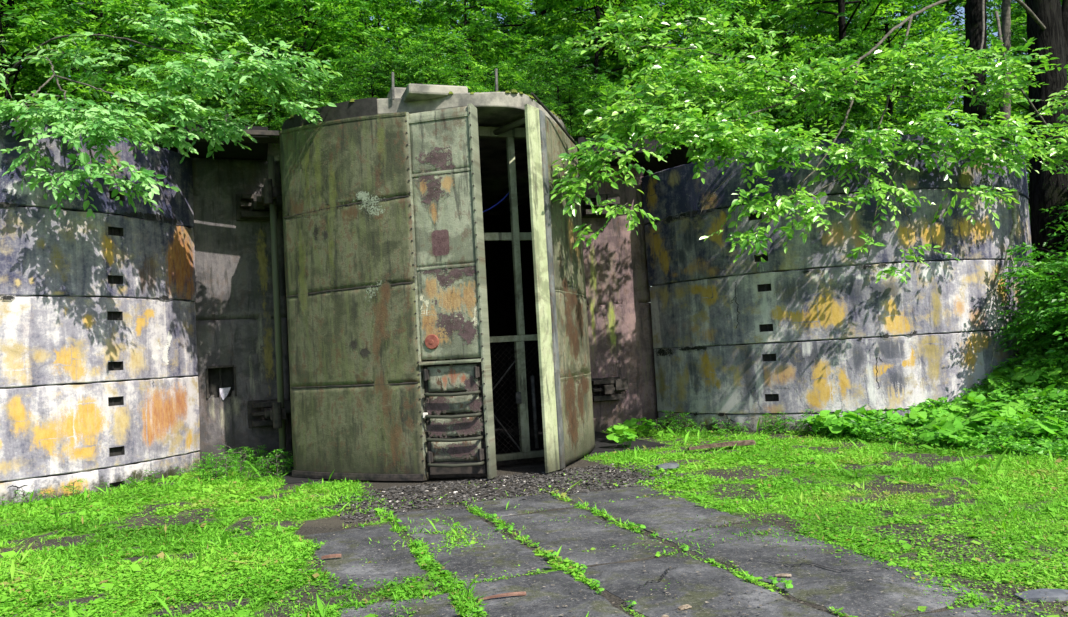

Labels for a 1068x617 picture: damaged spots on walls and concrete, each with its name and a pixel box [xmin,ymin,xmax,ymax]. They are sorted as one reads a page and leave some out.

rust [134,379,191,458]
rust [418,169,455,230]
rust [441,364,469,391]
water stain [571,232,618,363]
water stain [644,167,728,316]
water stain [655,211,1022,432]